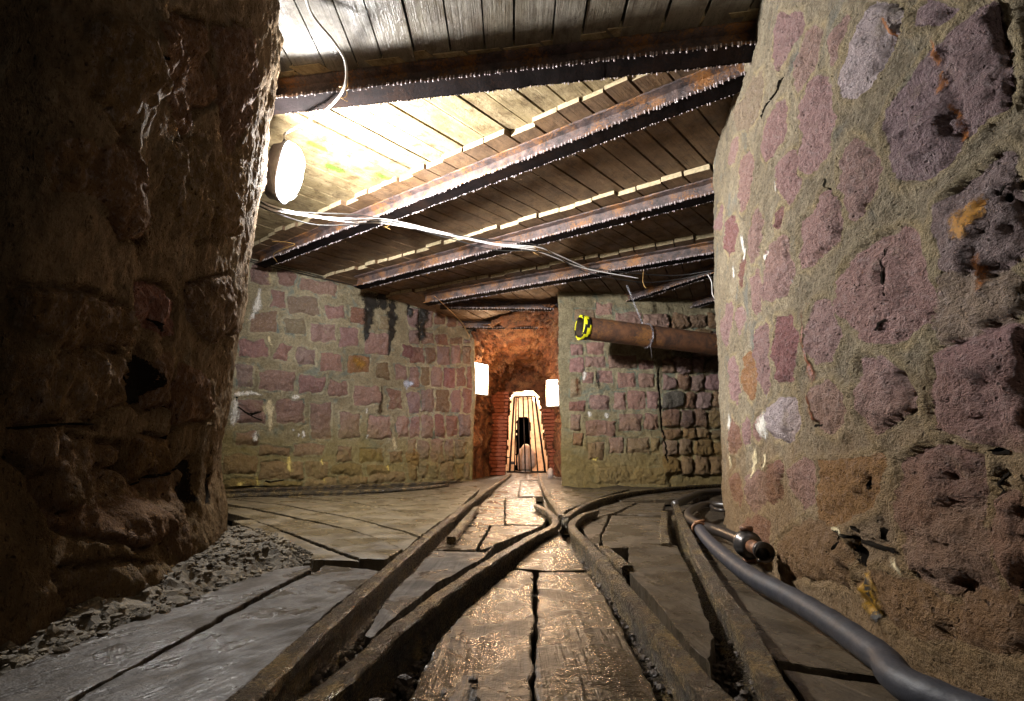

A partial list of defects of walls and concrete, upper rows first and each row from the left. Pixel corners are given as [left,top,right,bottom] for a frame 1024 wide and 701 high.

crack [760,77,784,119]
water stain [360,291,430,356]